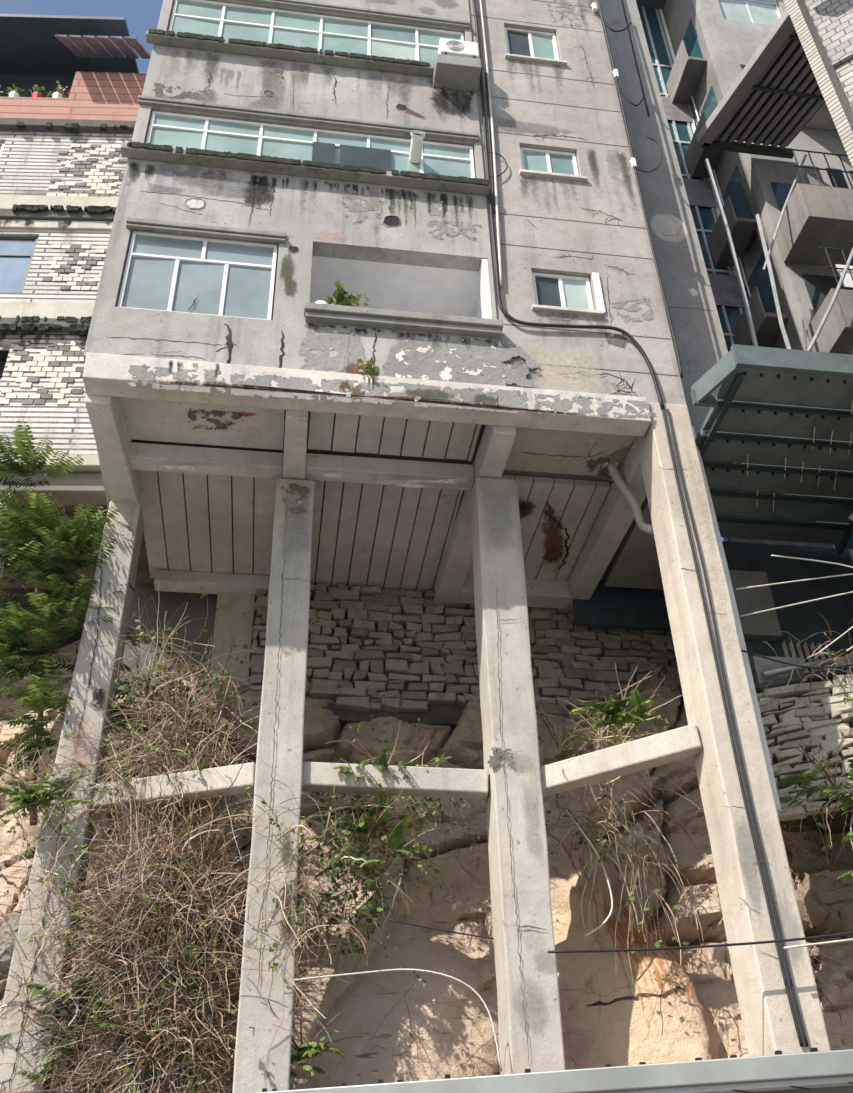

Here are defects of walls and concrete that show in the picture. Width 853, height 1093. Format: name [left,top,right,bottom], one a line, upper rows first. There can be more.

leakage [252,63,284,109]
leakage [433,92,471,116]
leakage [129,162,289,206]
leakage [382,189,472,215]
crack [106,324,236,364]
crack [278,330,286,368]
peeling [128,326,652,418]